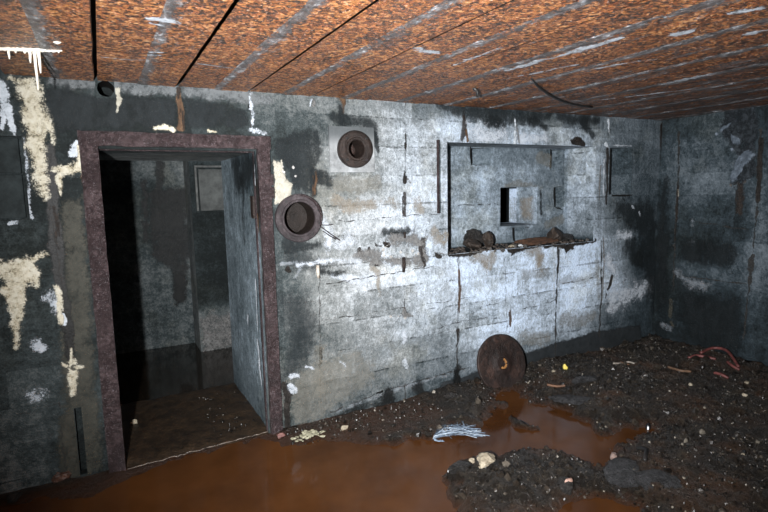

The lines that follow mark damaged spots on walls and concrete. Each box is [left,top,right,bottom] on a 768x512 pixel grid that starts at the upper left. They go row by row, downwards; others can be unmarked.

corrosion [176,87,185,132]
damp [330,105,379,152]
damp [275,130,333,197]
damp [281,219,354,252]
damp [607,176,669,314]
damp [0,75,273,478]
damp [296,259,383,285]
crack [306,236,605,420]
damp [334,388,395,417]